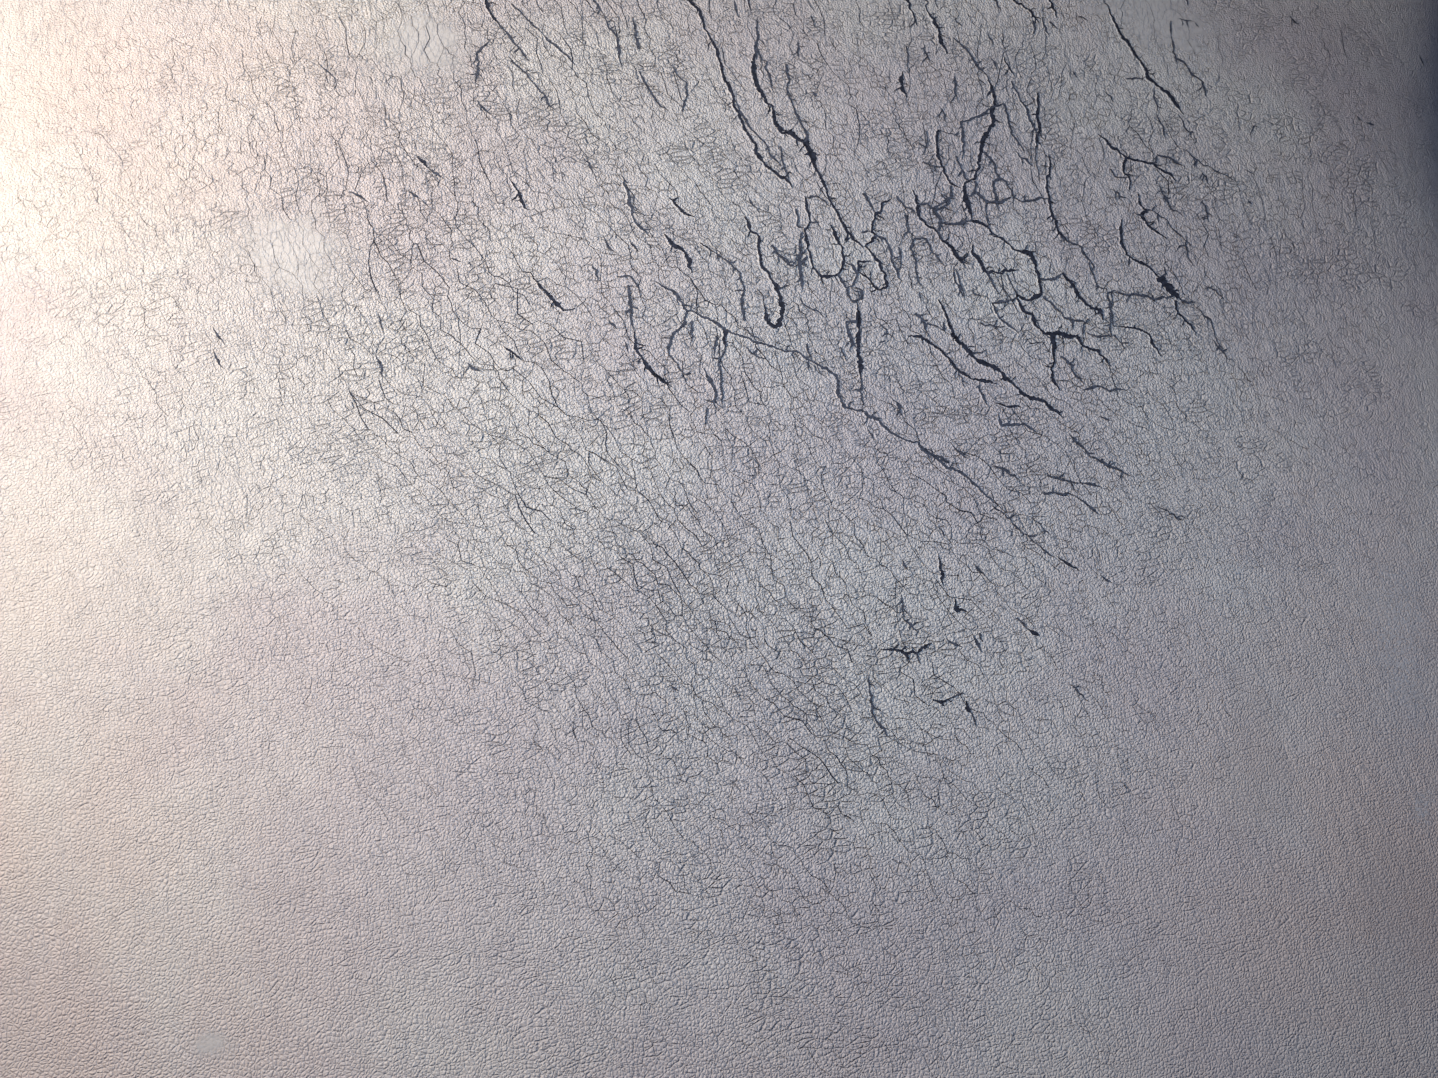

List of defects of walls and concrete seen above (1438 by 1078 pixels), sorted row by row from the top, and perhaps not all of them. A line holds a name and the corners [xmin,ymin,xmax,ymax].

crack [1193,826,1333,959]